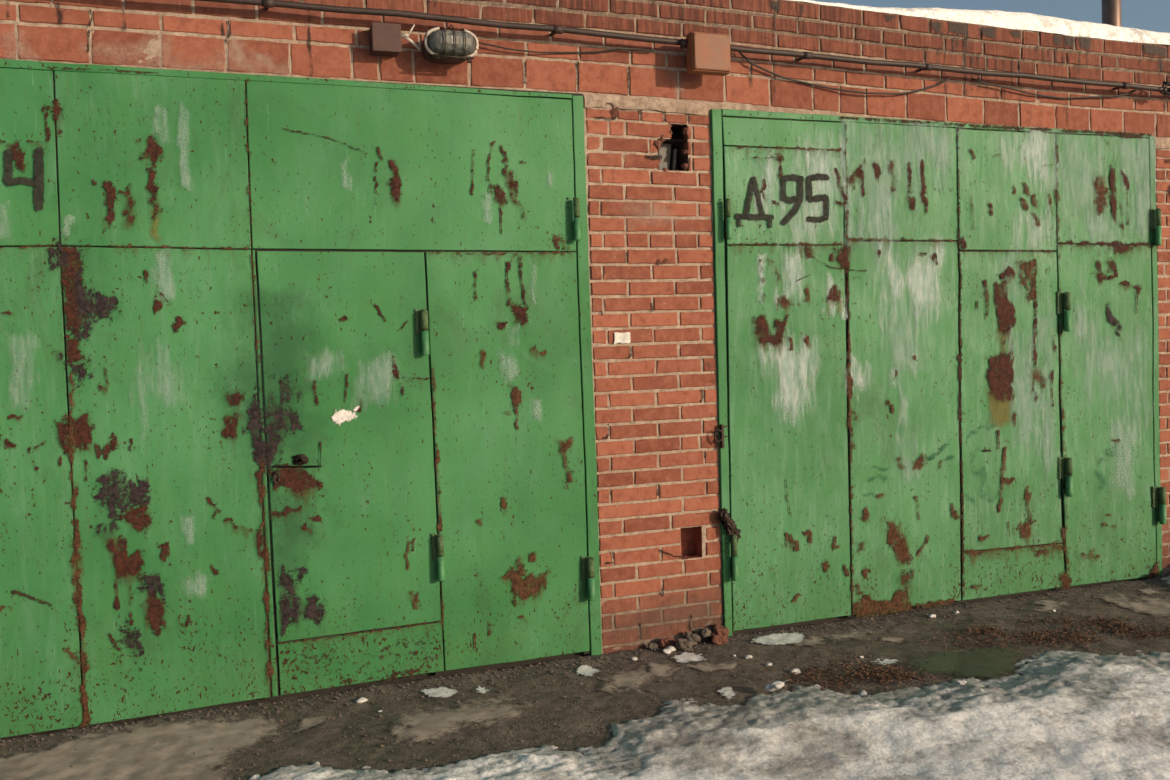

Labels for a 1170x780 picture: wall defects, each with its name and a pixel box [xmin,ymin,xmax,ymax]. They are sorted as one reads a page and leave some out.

corrosion [0,244,133,728]
corrosion [107,505,170,642]
corrosion [92,133,256,302]
corrosion [172,316,186,333]
corrosion [206,456,445,691]
corrosion [392,356,443,532]
corrosion [488,141,526,234]
corrosion [503,551,551,620]
spalling [654,122,689,172]
spalling [680,526,702,559]
corrosion [730,125,1100,617]
corrosion [976,145,1155,458]